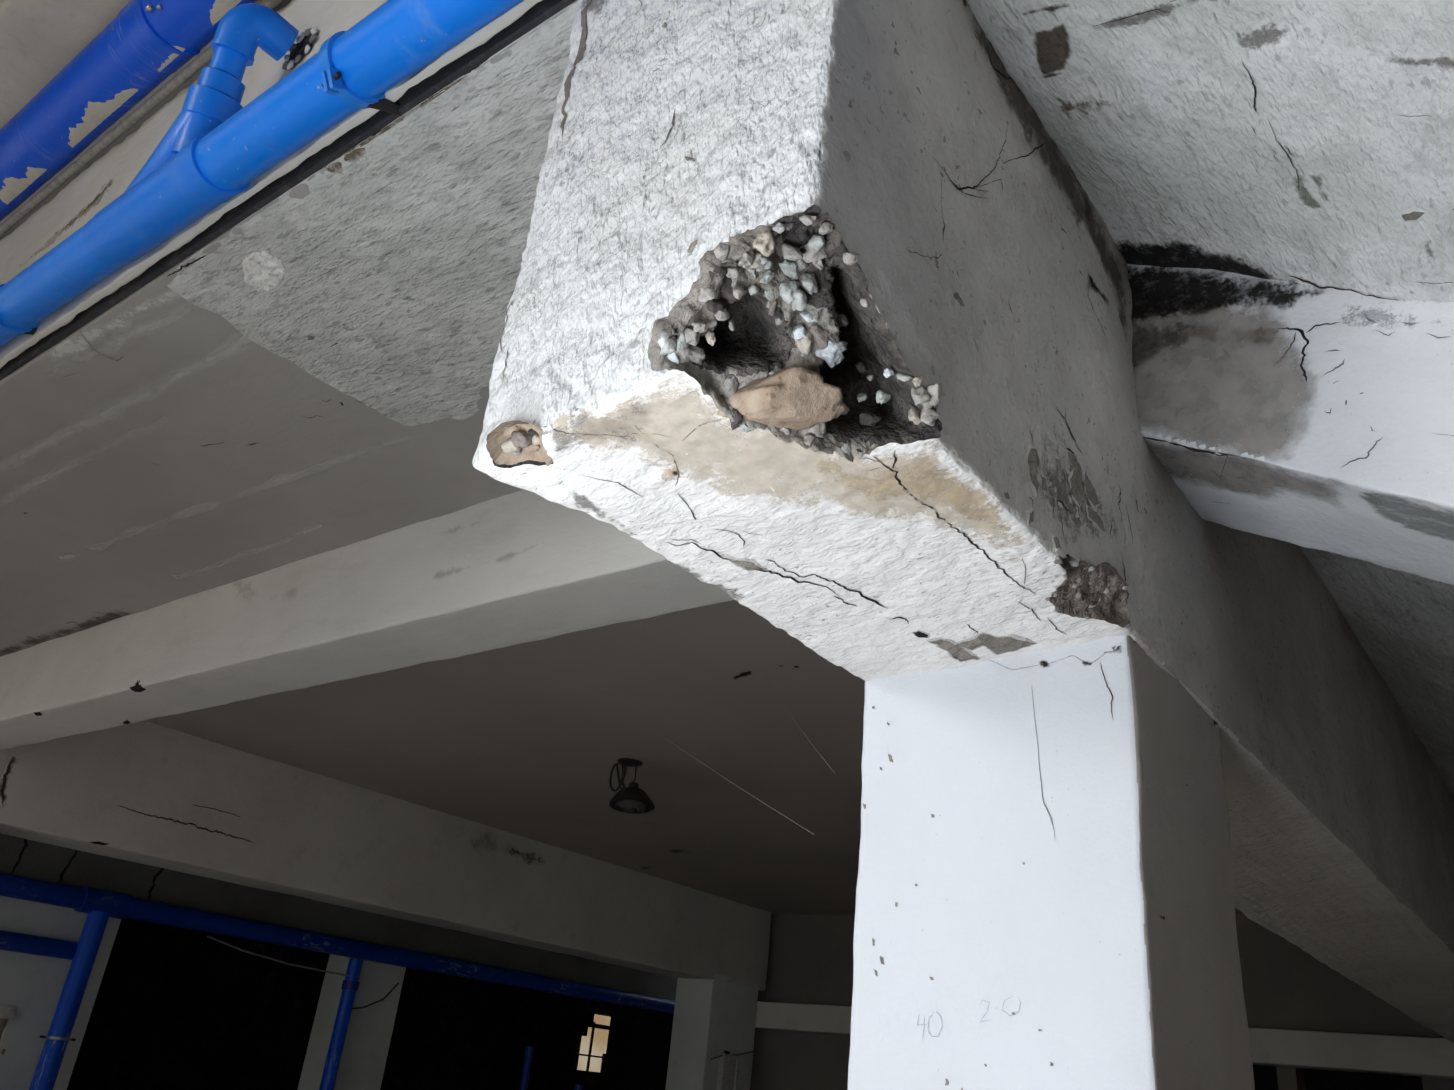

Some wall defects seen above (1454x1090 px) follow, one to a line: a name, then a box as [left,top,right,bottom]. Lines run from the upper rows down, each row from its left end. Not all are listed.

spalling [647,205,942,463]
spalling [486,420,553,467]
crack [546,420,909,624]
leakage [555,390,1019,546]
spalling [1002,431,1129,628]
peeling [912,624,1037,662]
crack [117,805,252,842]
crack [1032,691,1055,838]